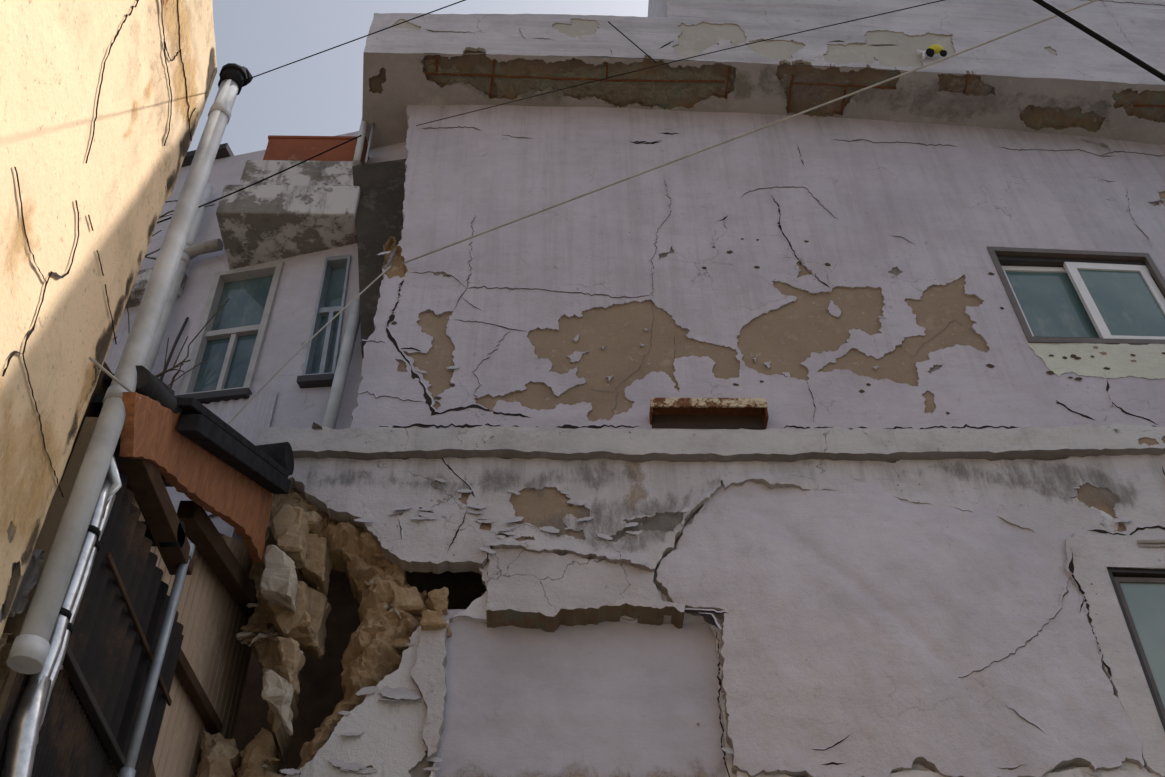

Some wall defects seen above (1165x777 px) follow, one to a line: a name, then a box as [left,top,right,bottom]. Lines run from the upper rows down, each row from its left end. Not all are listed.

crack [85,0,196,163]
water stain [164,0,216,192]
spalling [421,22,956,117]
spalling [937,71,996,96]
spalling [1019,88,1165,132]
crack [2,167,117,497]
water stain [68,252,142,444]
peeling [395,309,455,410]
crack [357,178,675,429]
peeling [474,260,994,421]
crack [780,381,1038,429]
crack [957,524,1165,680]